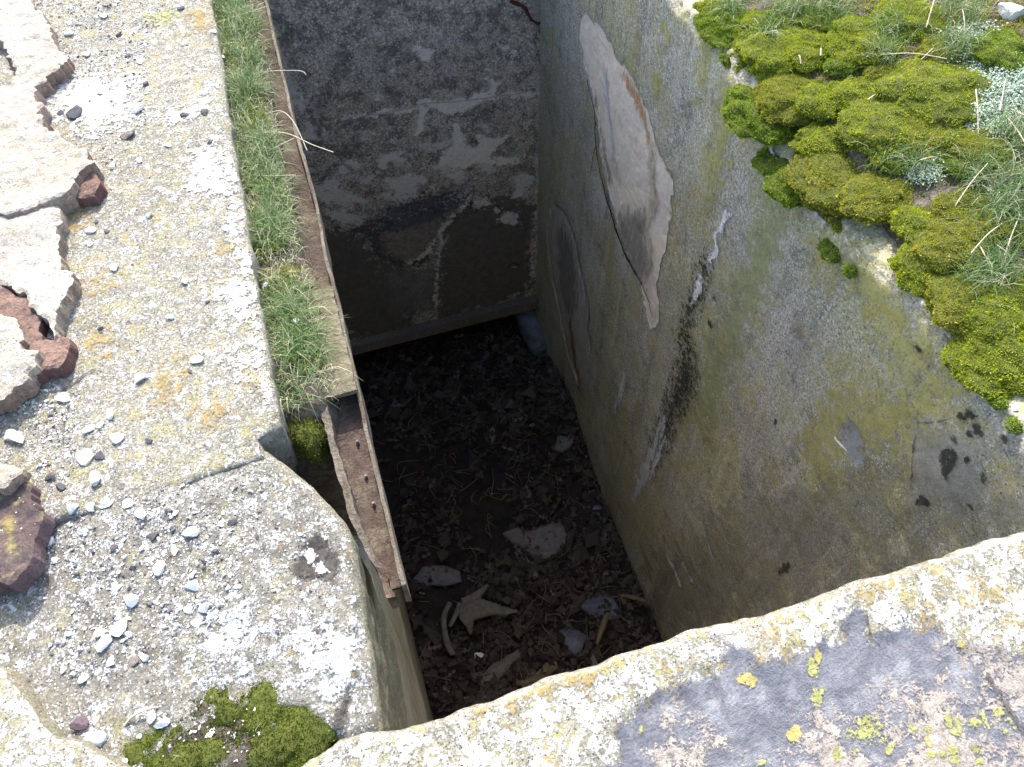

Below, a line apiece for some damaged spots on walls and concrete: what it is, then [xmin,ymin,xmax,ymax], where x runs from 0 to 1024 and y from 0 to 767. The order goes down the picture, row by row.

damp [297,74,539,141]
damp [323,143,539,341]
spalling [579,13,674,330]
damp [630,208,732,505]